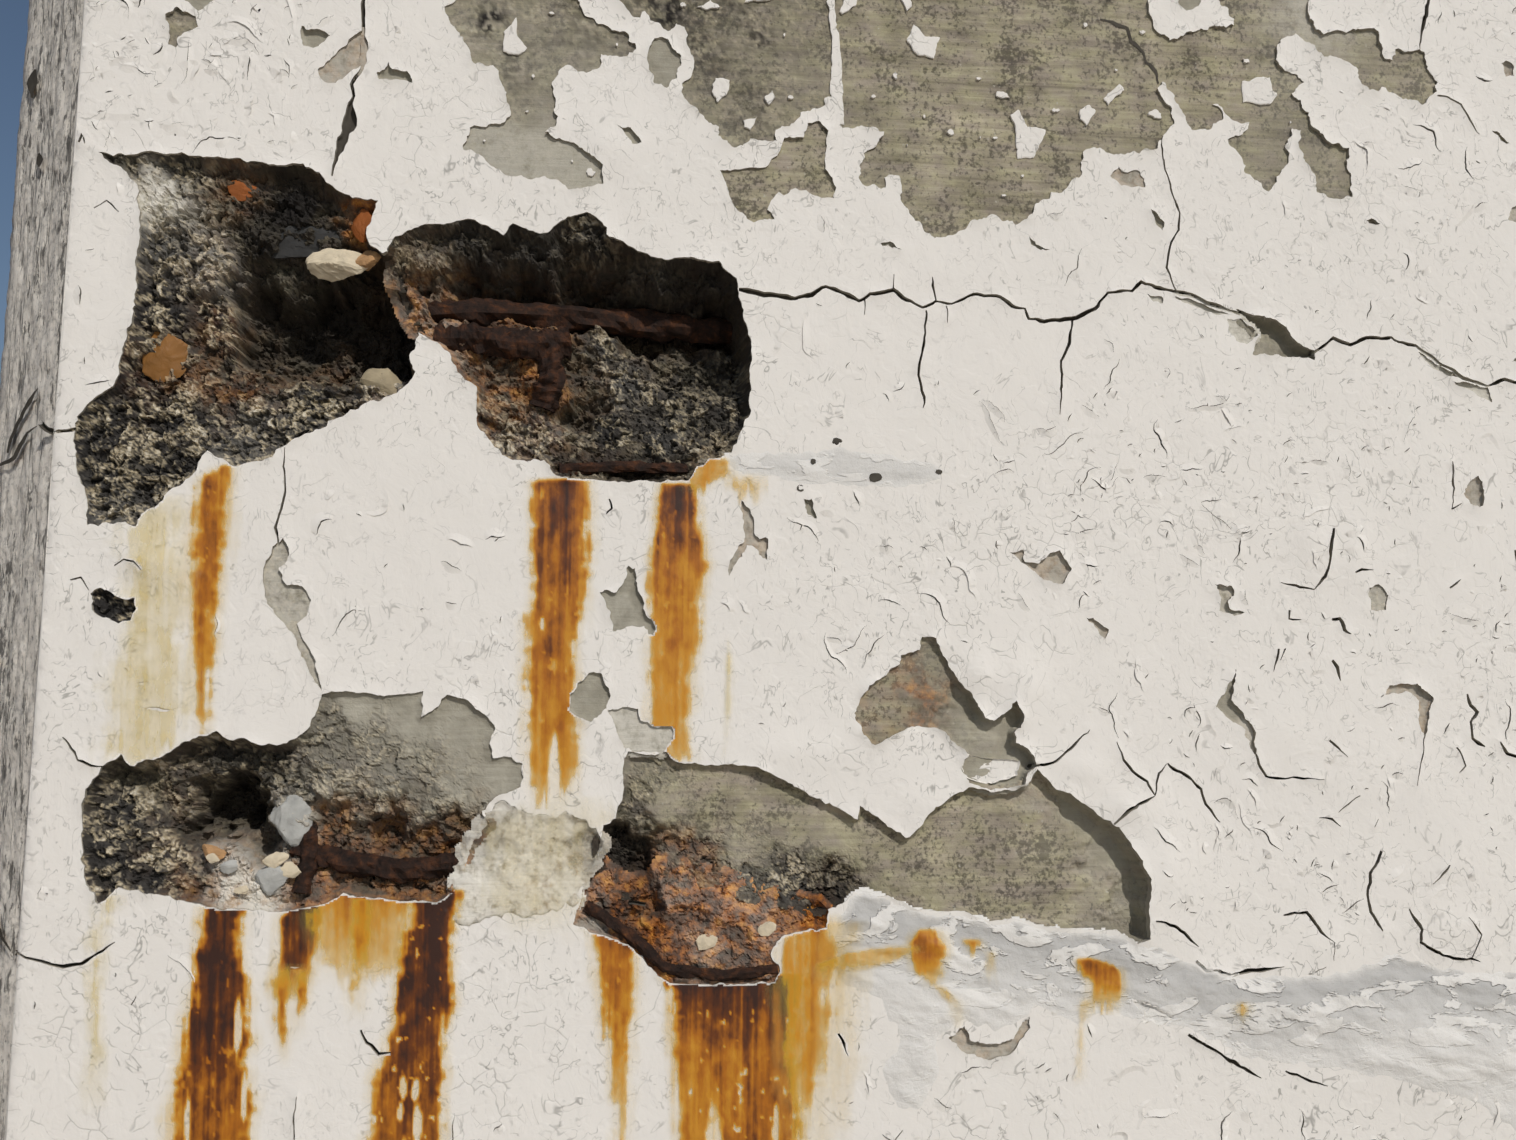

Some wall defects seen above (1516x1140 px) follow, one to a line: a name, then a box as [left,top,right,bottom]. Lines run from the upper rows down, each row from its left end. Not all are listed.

crack [333,0,365,172]
peeling [445,0,1436,238]
spalling [70,152,751,526]
crack [743,230,1243,406]
crack [1308,337,1438,367]
corrosion [523,478,593,803]
corrosion [645,459,747,761]
spalling [81,536,1148,985]
crack [0,928,115,968]
corrosion [171,909,257,1140]
corrosion [271,889,464,1140]
corrosion [663,924,946,1140]